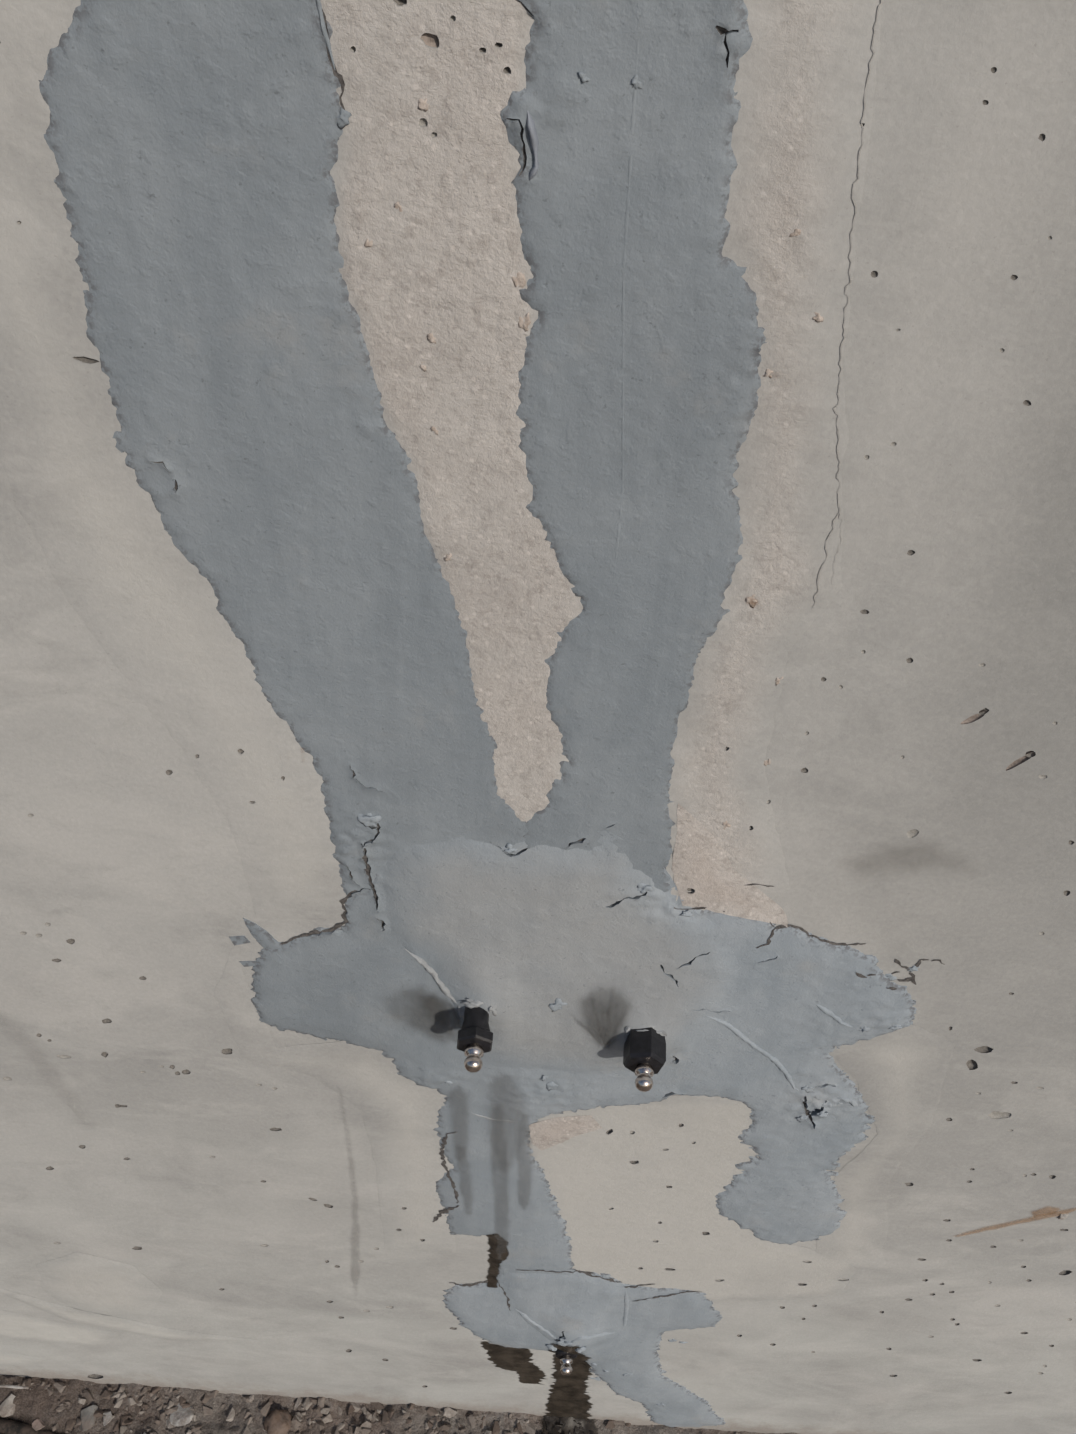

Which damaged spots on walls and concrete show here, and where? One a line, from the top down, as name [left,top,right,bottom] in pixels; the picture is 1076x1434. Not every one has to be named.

crack [812,0,882,609]
spalling [320,0,583,822]
spalling [666,0,881,910]
spalling [0,0,456,1253]
crack [281,823,384,945]
crack [674,884,774,912]
crack [757,922,945,990]
leakage [486,1234,508,1288]
leakage [481,1341,598,1434]